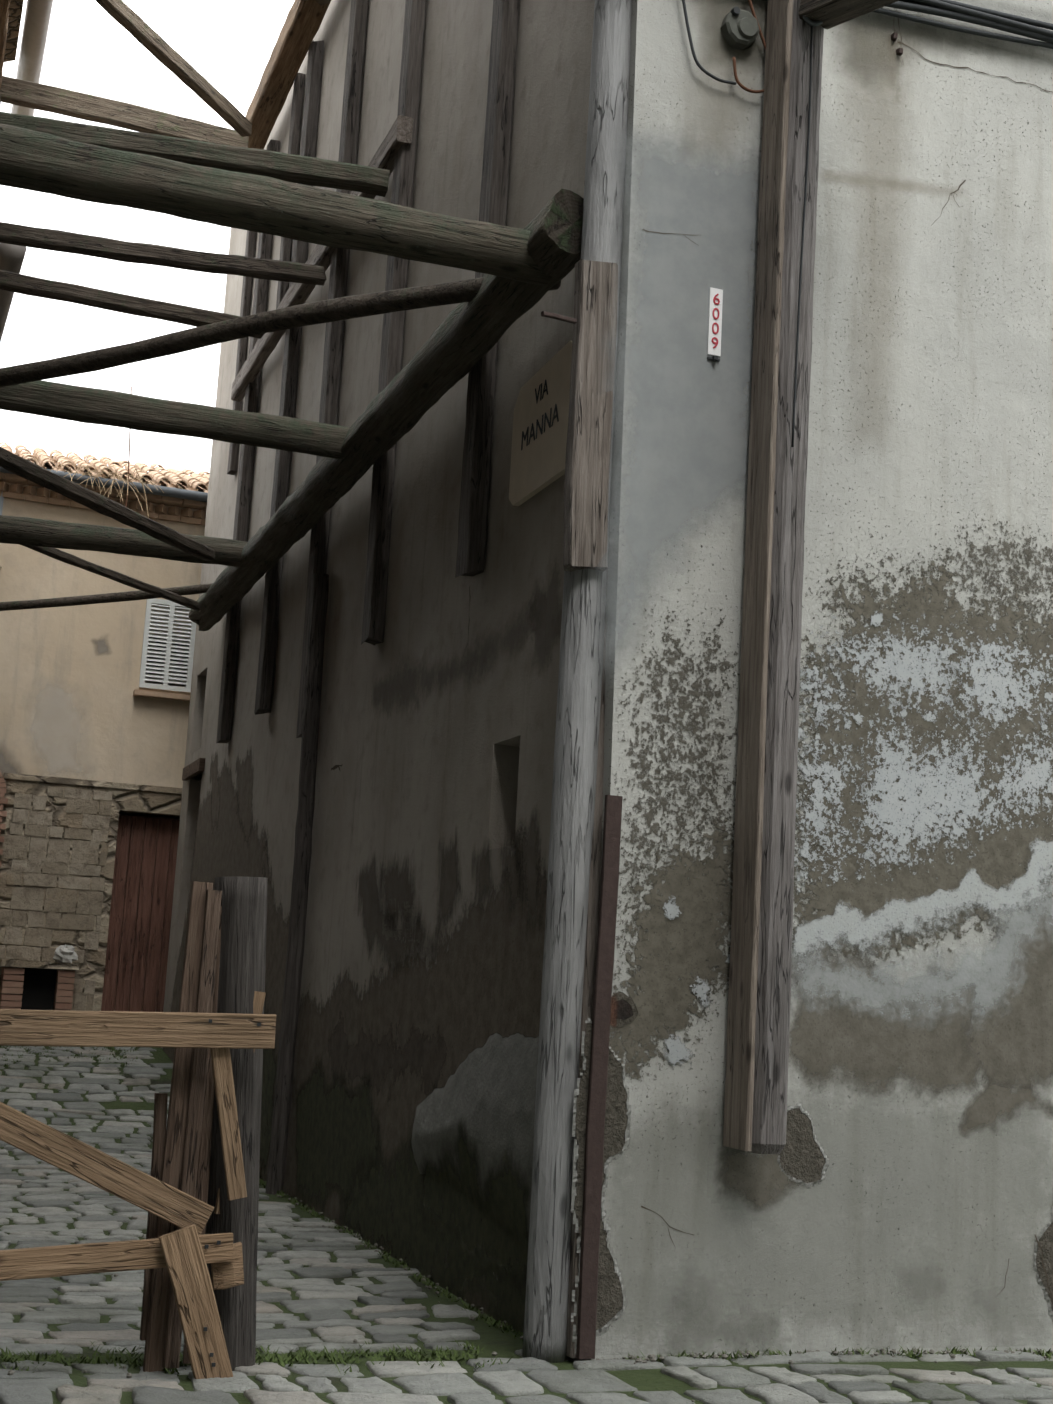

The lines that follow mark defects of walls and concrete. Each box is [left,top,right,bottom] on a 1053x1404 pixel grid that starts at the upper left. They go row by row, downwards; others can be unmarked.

crack [893,8,1052,92]
peeling [792,514,1053,985]
leakage [171,750,547,1333]
flaking render [571,1018,592,1354]
peeling [596,590,740,1336]
flaking render [777,1104,829,1189]
flaking render [1034,1206,1053,1322]